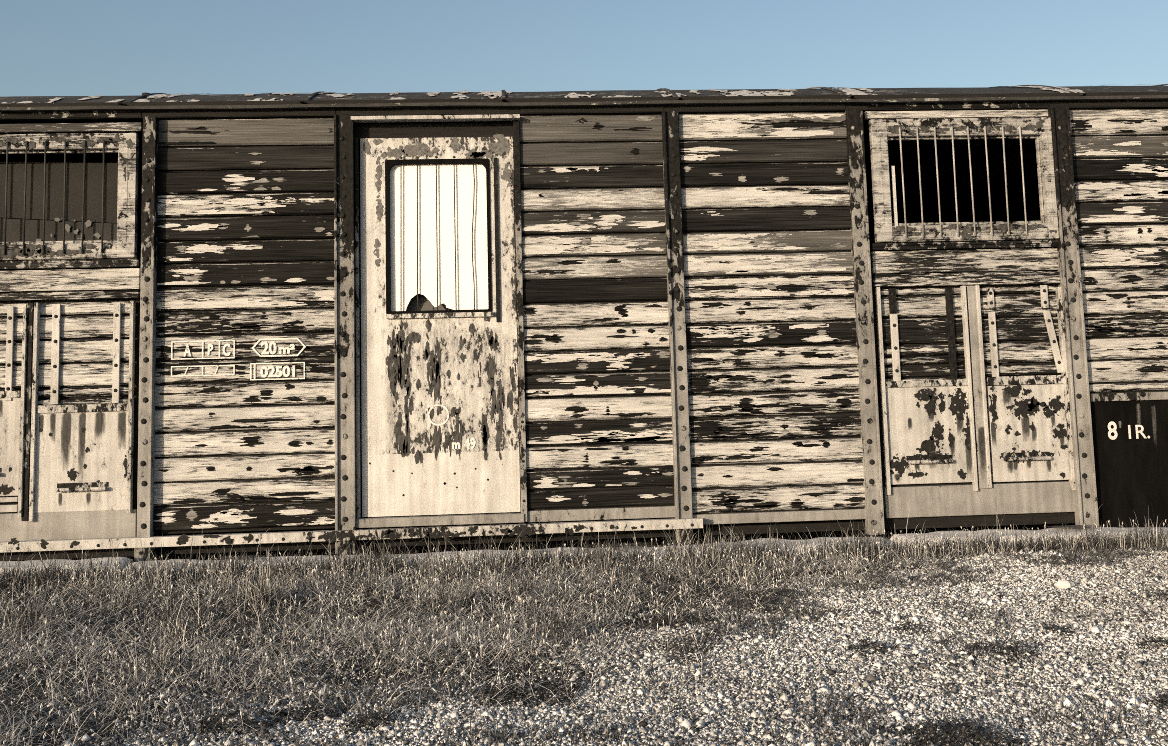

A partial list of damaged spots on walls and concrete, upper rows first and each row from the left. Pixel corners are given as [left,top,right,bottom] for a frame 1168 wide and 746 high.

peeling [679,114,846,172]
peeling [156,153,335,377]
peeling [522,214,665,275]
peeling [1071,118,1168,351]
corrosion [0,467,14,495]
peeling [159,386,296,447]
peeling [154,488,477,545]
corrosion [385,317,517,474]
peeling [525,304,674,506]
peeling [684,233,861,476]
peeling [708,478,865,510]
corrosion [890,385,1068,481]